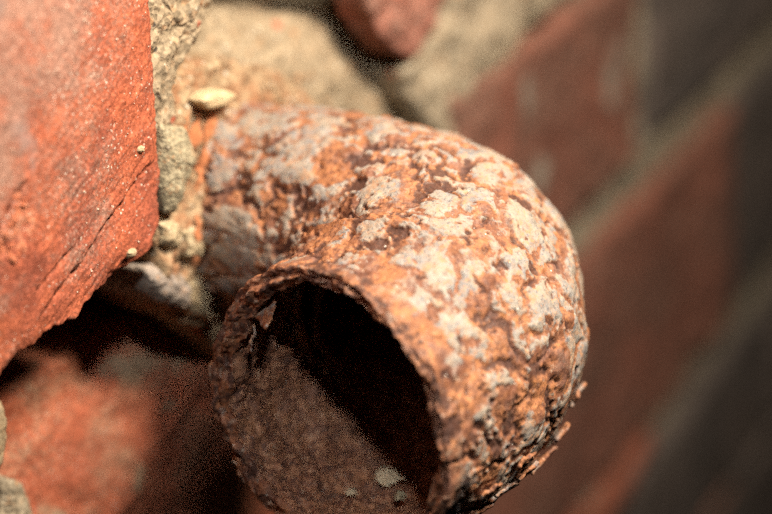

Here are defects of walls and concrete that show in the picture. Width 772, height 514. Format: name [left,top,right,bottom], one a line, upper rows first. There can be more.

corrosion [184,110,224,187]
crack [0,179,29,253]
crack [34,156,156,318]
corrosion [194,215,202,243]
corrosion [249,293,279,353]
corrosion [568,382,587,408]
corrosion [471,422,571,514]